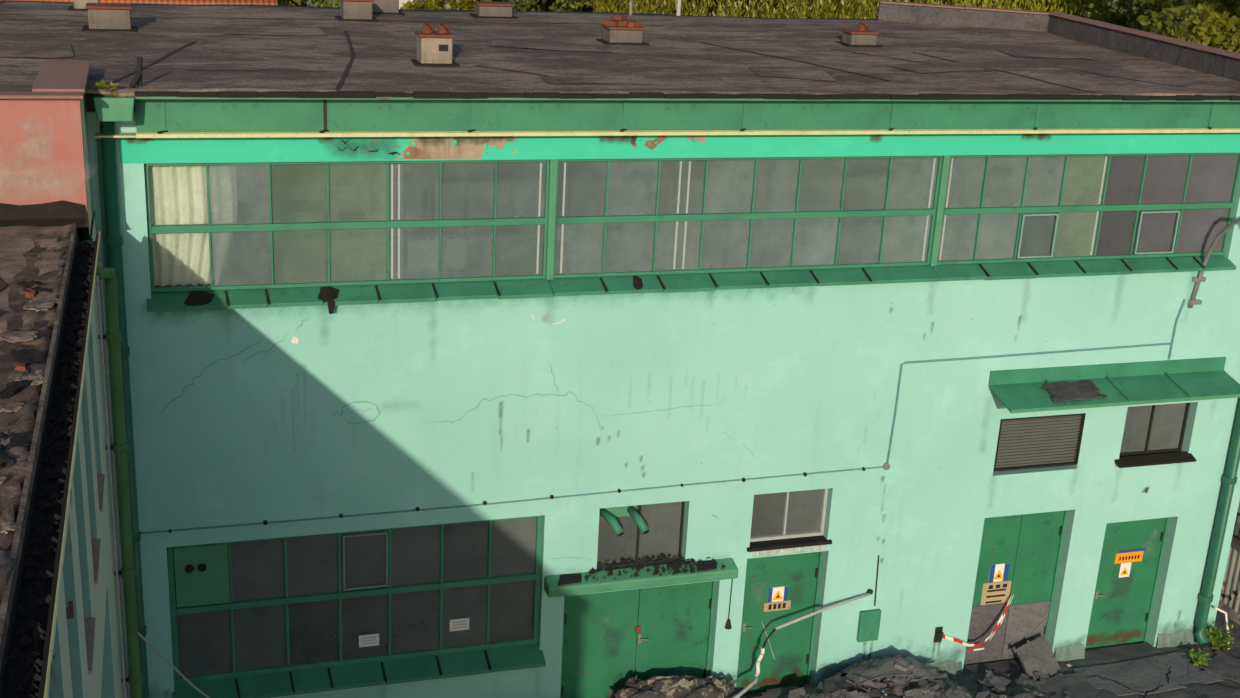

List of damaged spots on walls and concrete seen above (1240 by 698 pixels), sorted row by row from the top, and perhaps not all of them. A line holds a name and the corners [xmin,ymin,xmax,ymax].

peeling [396,136,523,160]
peeling [631,135,668,149]
crack [158,319,309,414]
crack [426,359,758,460]
crack [1090,666,1240,698]